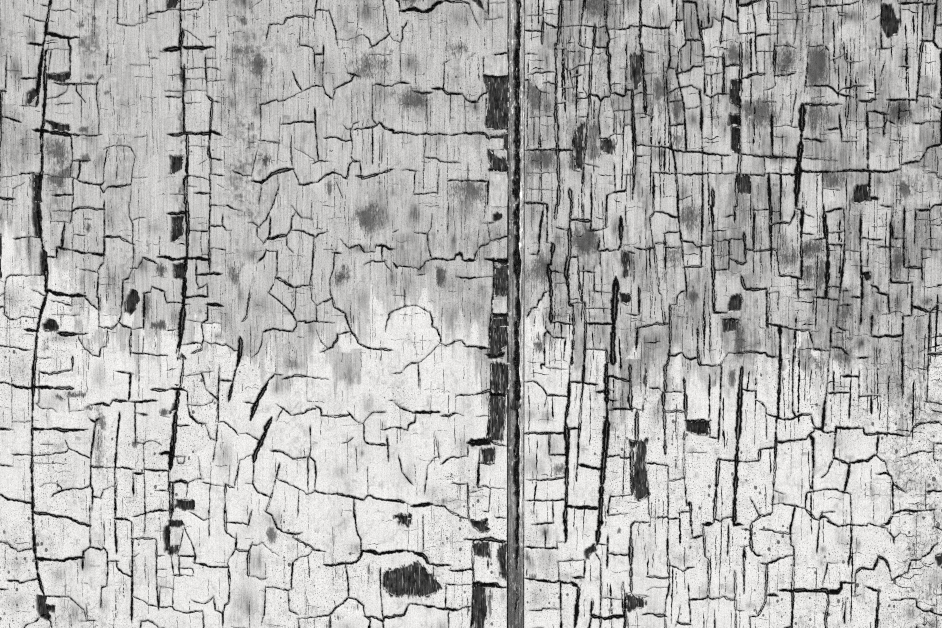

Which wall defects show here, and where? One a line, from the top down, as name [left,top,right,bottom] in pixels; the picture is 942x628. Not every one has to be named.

peeling [880,5,899,37]
peeling [484,55,509,221]
crack [0,0,509,628]
peeling [471,257,511,464]
peeling [629,438,648,501]
peeling [383,561,442,598]
peeling [471,582,494,628]
peeling [471,518,507,580]